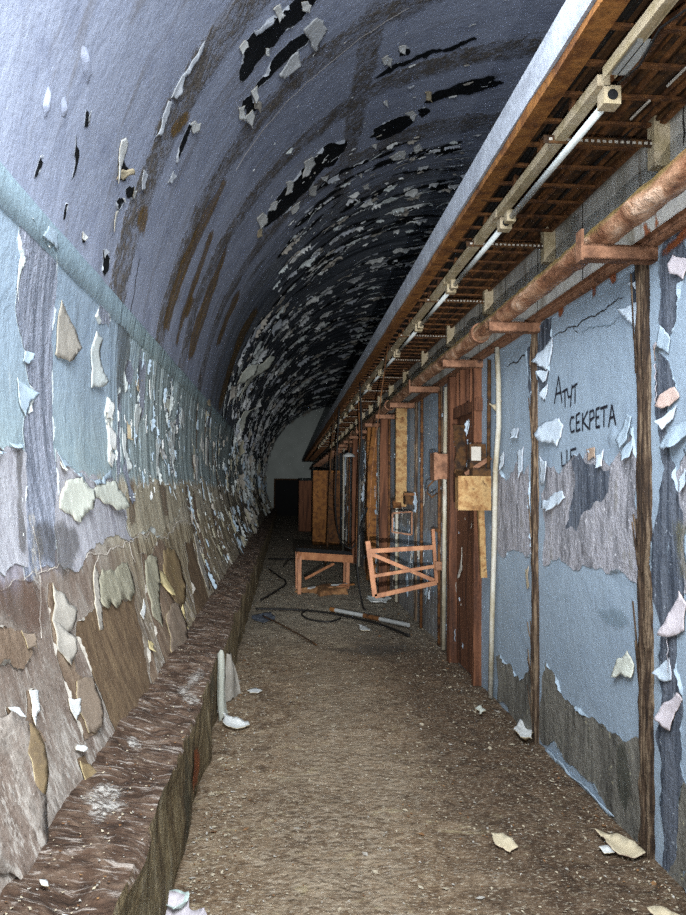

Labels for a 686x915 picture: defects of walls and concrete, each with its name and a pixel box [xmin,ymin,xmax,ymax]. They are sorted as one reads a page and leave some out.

peeling [157,41,205,136]
peeling [239,0,328,128]
peeling [374,24,478,79]
peeling [525,317,553,402]
peeling [617,270,636,328]
peeling [0,76,504,780]
peeling [490,414,638,589]
peeling [0,688,49,880]
peeling [496,651,640,843]